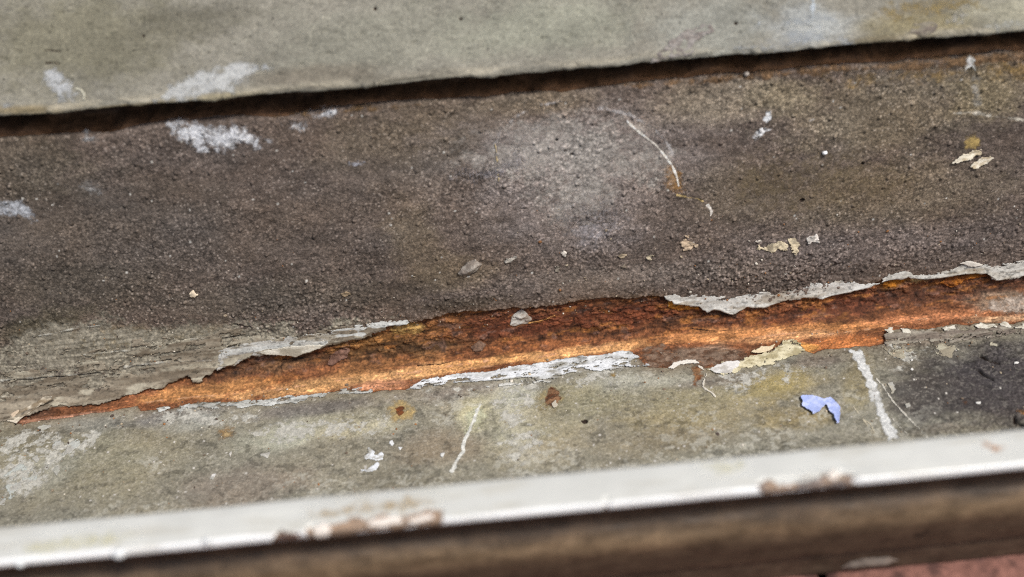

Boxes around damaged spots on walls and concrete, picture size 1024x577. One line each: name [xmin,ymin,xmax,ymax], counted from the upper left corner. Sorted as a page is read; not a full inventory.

efflorescence [168,122,269,152]
spalling [0,260,1024,431]
rust [692,365,716,397]
rust [389,400,415,421]
rust [539,387,564,410]